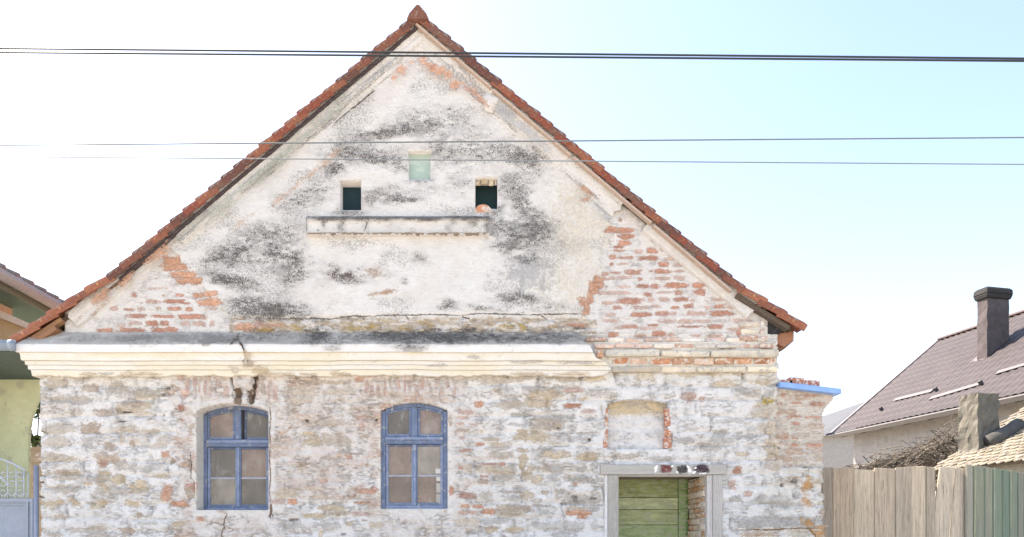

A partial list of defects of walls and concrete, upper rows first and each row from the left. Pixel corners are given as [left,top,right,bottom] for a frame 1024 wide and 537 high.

flaking render [90,241,222,333]
leakage [116,101,602,350]
flaking render [548,219,751,338]
peeling [36,372,207,537]
crack [230,333,273,518]
peeling [223,350,406,406]
peeling [272,415,386,537]
peeling [443,360,643,534]
peeling [637,373,824,537]